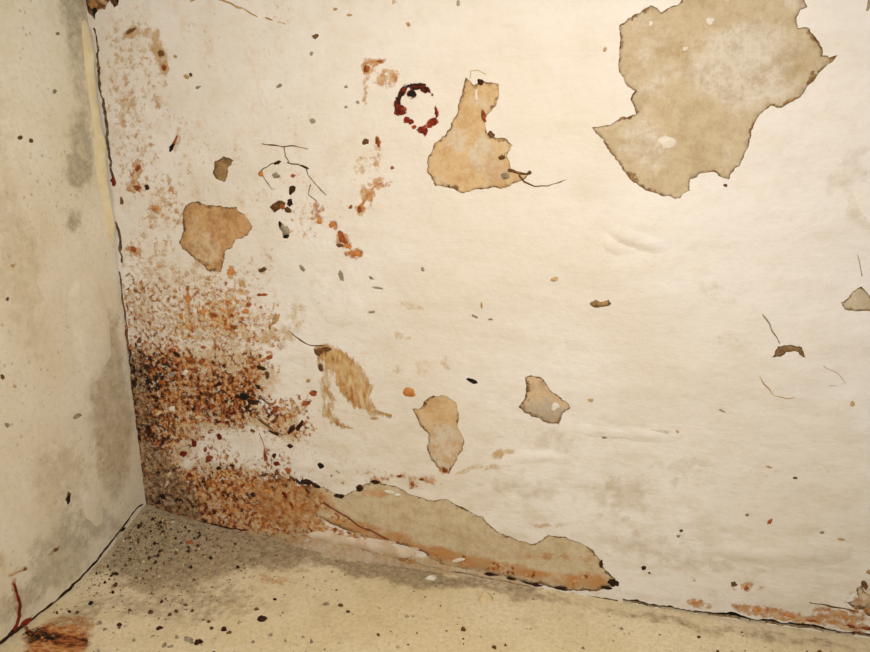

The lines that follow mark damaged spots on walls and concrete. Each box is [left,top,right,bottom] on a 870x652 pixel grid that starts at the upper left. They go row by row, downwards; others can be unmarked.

corrosion [108,23,183,238]
corrosion [361,59,439,137]
peeling [427,70,565,193]
peeling [592,0,837,199]
peeling [179,201,253,272]
corrosion [289,204,363,258]
corrosion [349,177,390,216]
corrosion [118,240,385,556]
peeling [413,395,464,473]
peeling [519,375,570,424]
peeling [298,479,619,591]
corrosion [732,604,868,633]